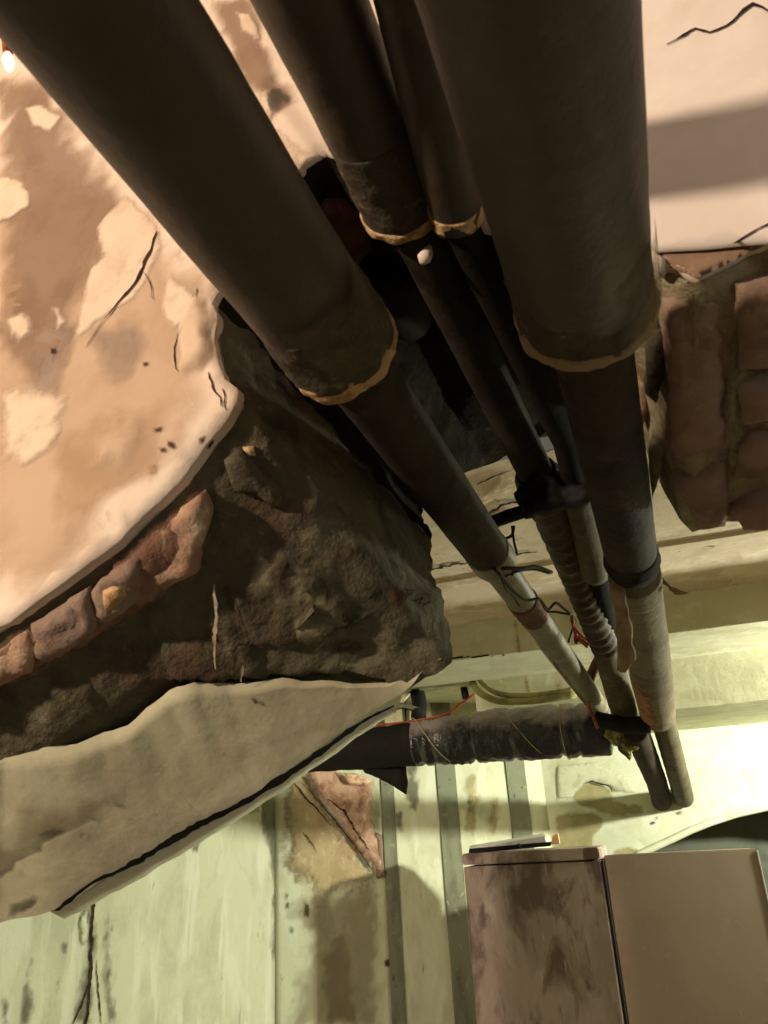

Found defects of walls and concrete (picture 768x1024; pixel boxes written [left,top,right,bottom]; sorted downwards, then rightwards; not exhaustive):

crack [667,2,768,44]
crack [87,231,157,345]
spalling [651,245,763,279]
spalling [0,308,453,760]
crack [54,705,395,1024]
leakage [262,798,275,883]
spalling [285,771,385,894]